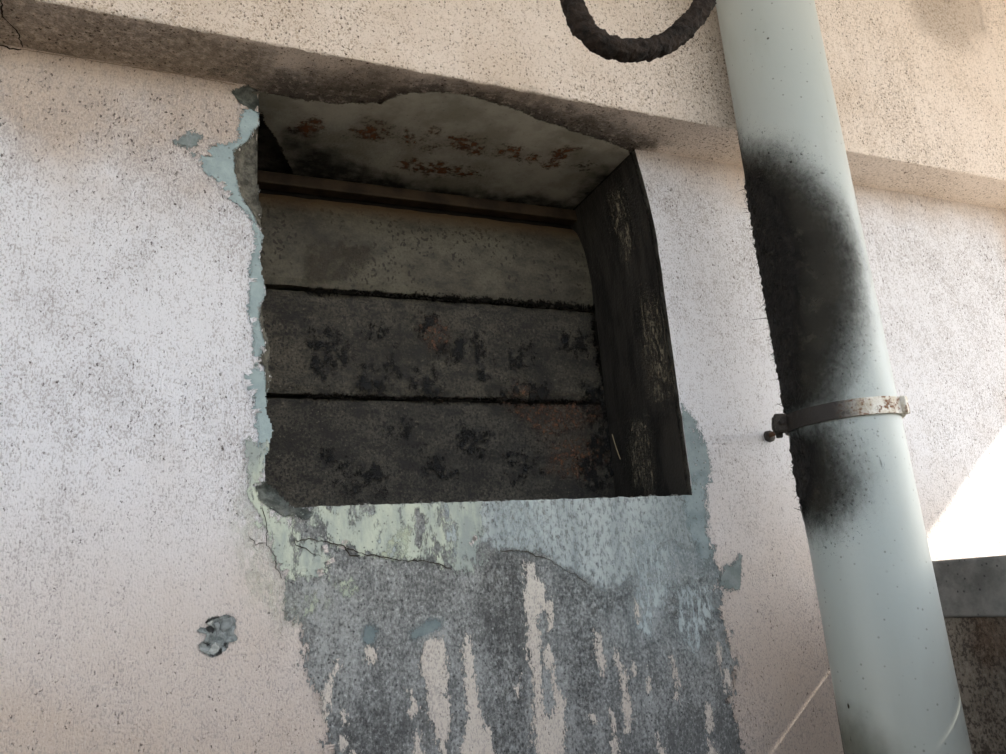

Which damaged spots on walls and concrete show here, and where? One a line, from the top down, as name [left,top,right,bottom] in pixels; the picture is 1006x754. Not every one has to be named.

crack [0,0,235,85]
corrosion [343,117,592,178]
peeling [173,85,746,754]
crack [500,550,589,585]